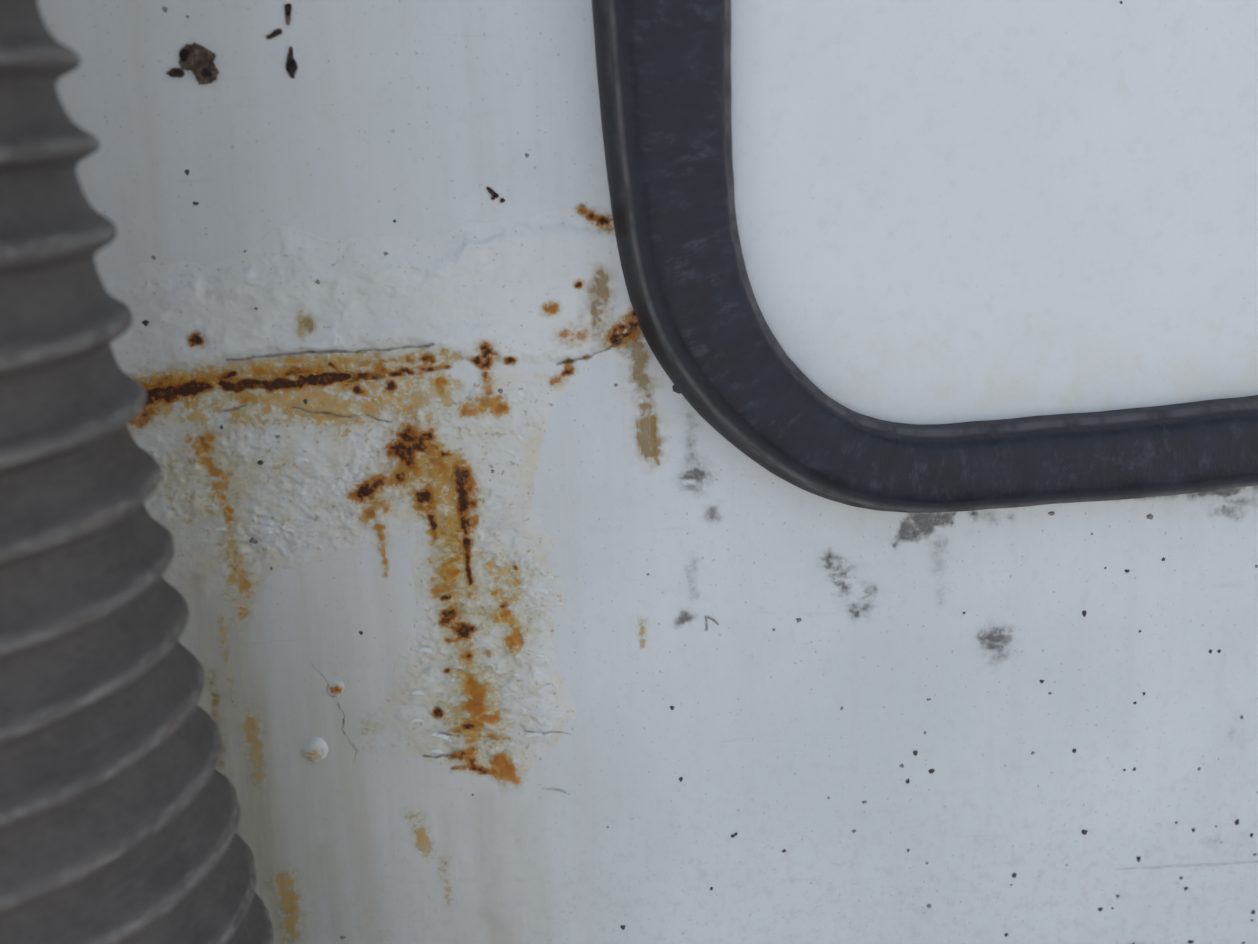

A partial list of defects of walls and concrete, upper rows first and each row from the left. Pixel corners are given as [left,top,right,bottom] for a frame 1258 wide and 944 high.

peeling [266,3,292,39]
peeling [166,42,219,85]
peeling [286,46,298,78]
rust [578,204,613,231]
rust [543,302,559,315]
rust [550,270,661,465]
rust [130,341,524,785]